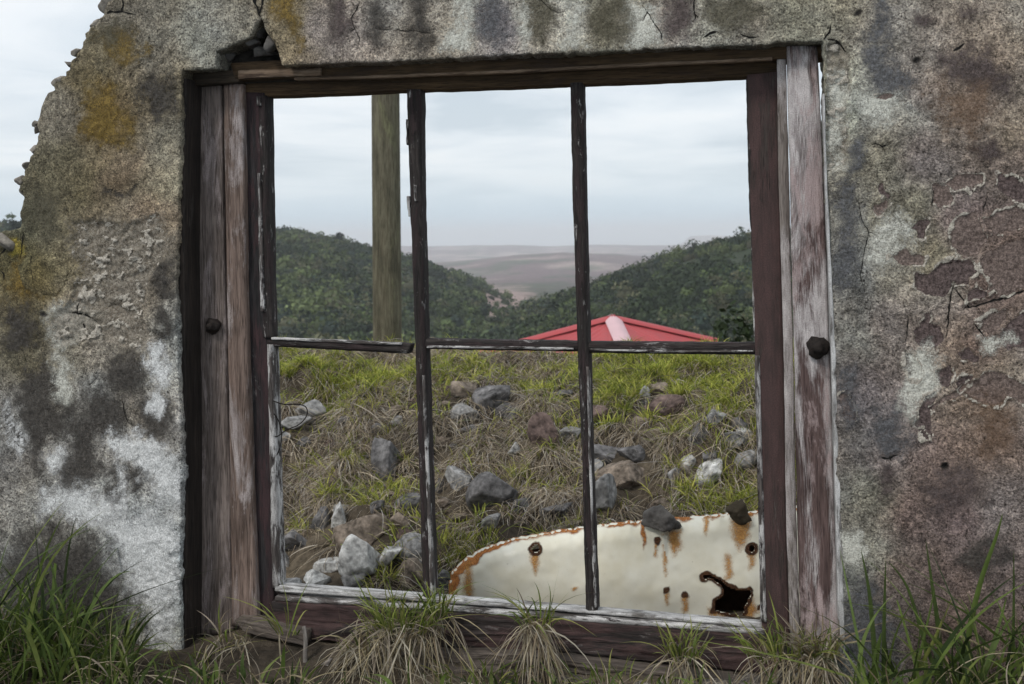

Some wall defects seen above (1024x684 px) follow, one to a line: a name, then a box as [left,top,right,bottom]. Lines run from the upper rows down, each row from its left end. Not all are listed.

damp [325,0,389,49]
damp [405,0,761,51]
damp [826,0,912,170]
damp [938,44,1012,93]
spalling [40,214,169,348]
damp [832,180,916,287]
peeling [886,170,1024,350]
peeling [900,313,1024,443]
damp [0,262,181,649]